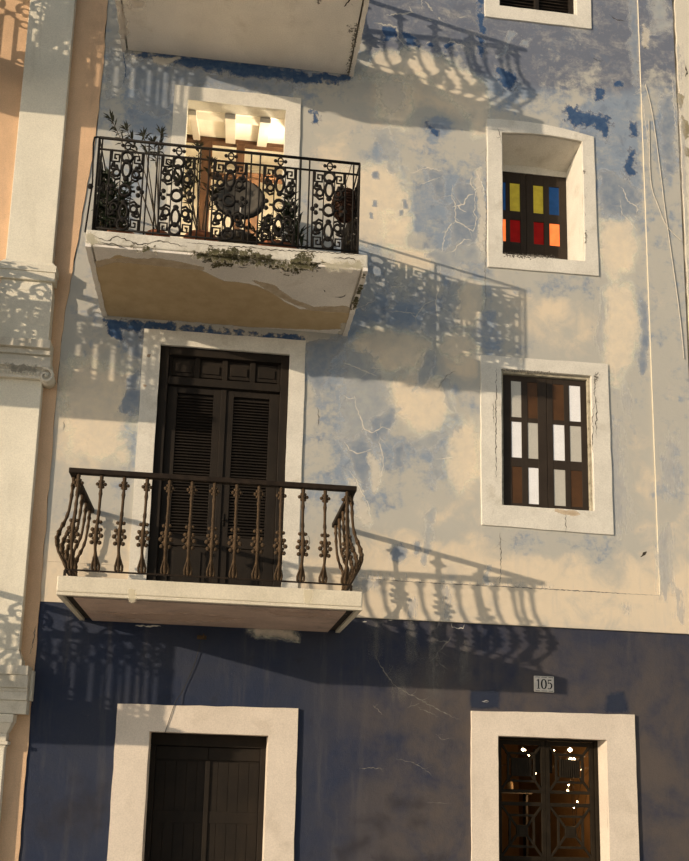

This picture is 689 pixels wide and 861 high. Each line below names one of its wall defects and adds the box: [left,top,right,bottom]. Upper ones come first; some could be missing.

peeling [366,25,489,134]
peeling [562,104,615,143]
peeling [659,93,689,178]
crack [323,130,503,324]
peeling [345,164,481,310]
peeling [597,121,650,384]
peeling [103,318,476,524]
crack [343,395,390,518]
crack [491,368,499,470]
crack [591,372,599,450]
crack [376,657,460,740]